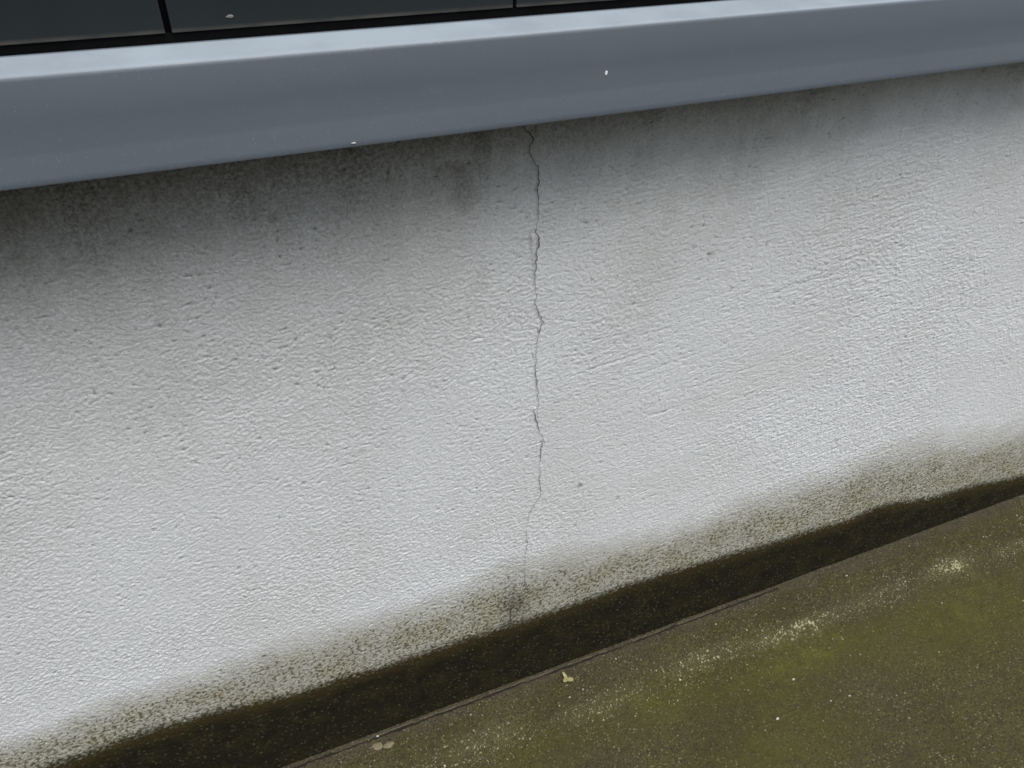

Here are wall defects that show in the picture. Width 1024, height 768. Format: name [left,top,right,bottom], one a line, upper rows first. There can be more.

water stain [0,439,1024,768]
crack [510,125,546,623]